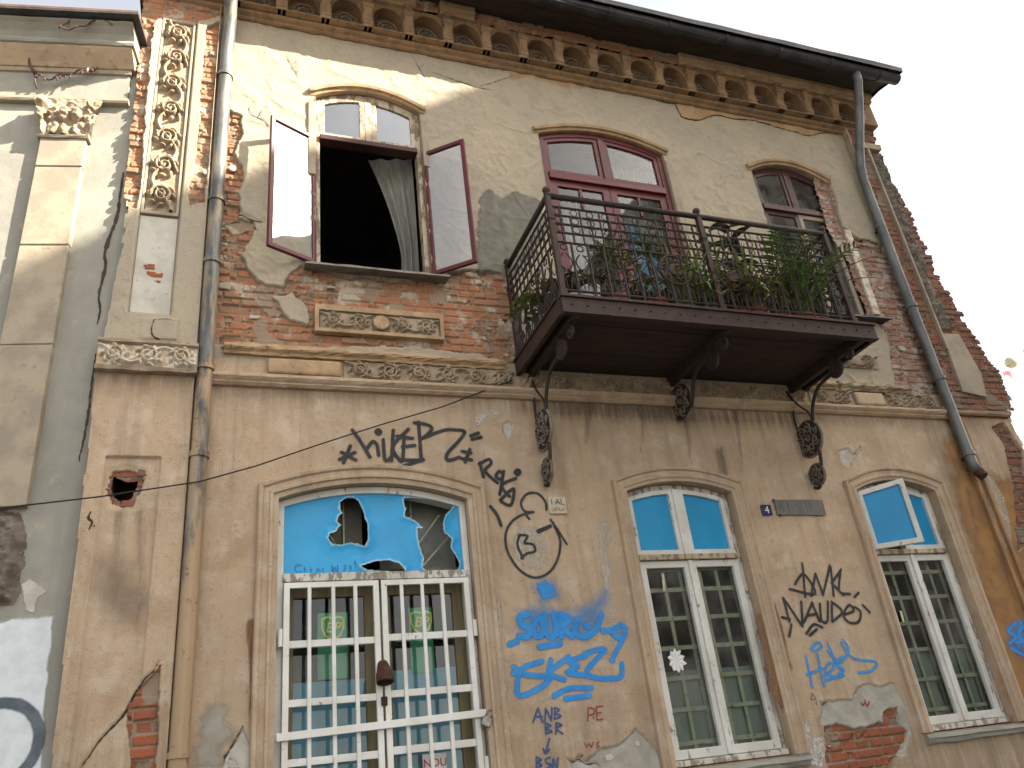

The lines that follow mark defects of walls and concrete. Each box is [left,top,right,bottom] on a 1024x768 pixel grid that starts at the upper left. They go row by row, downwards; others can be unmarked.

crack [97,172,124,324]
flaking render [143,264,165,283]
flaking render [215,114,518,364]
flaking render [813,131,1015,411]
crack [79,354,96,461]
flaking render [105,469,147,508]
spalling [0,510,47,613]
crack [82,665,157,765]
flaking render [127,671,160,768]
peeling [571,729,660,768]
flaking render [820,683,911,768]